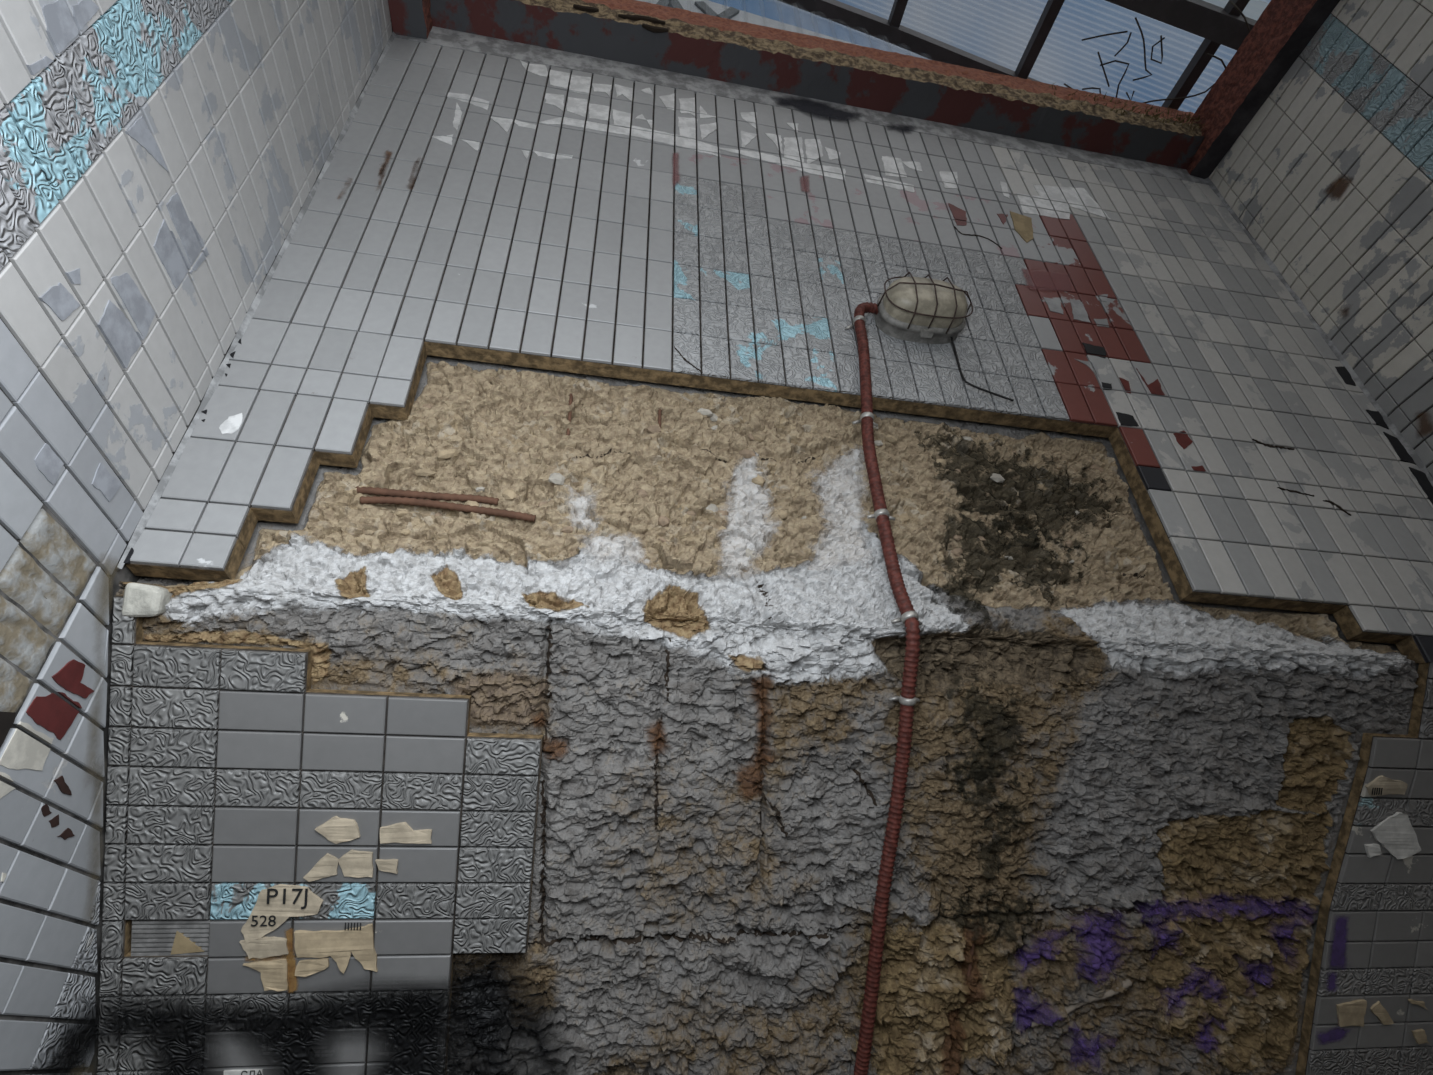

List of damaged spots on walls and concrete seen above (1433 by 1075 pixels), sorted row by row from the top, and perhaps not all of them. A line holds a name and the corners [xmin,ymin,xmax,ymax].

peeling [1043,294,1109,328]
peeling [1075,342,1165,396]
peeling [0,509,96,799]
spalling [452,671,550,727]
spalling [121,361,1399,695]
water stain [914,422,1125,635]
crack [1106,571,1146,579]
peeling [41,804,75,840]
crack [478,619,1260,948]
spalling [1144,715,1355,1073]
water stain [43,988,451,1075]
spalling [844,914,1019,1075]